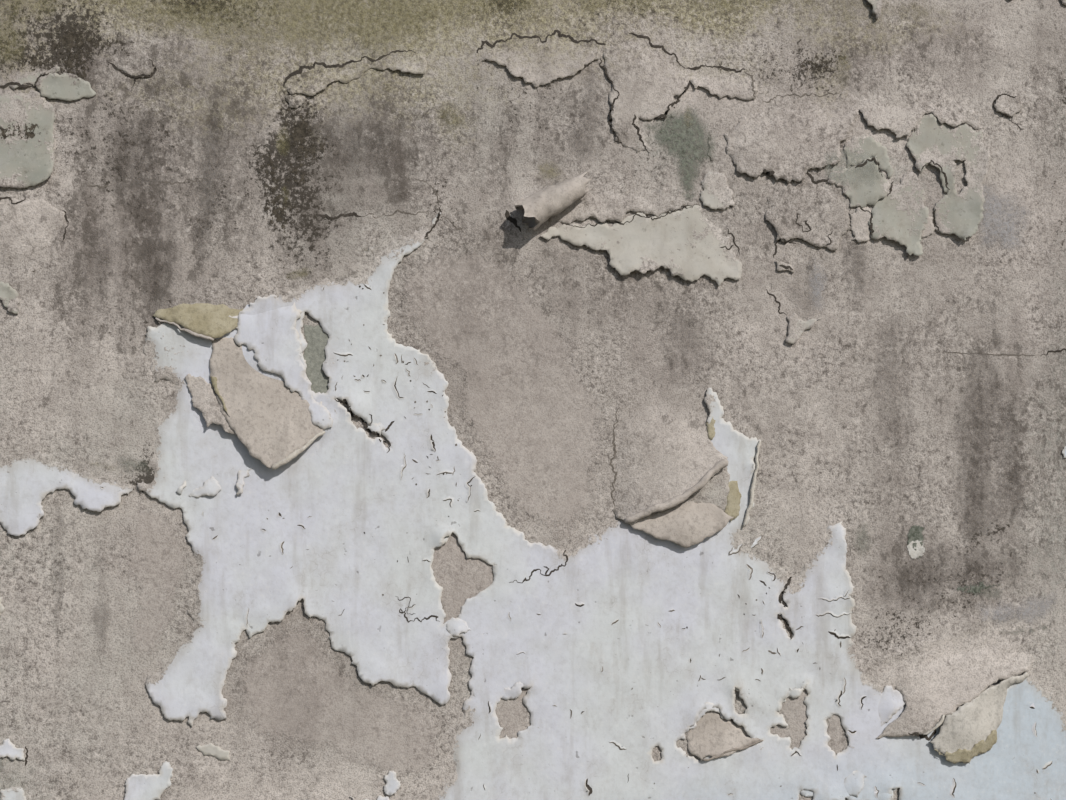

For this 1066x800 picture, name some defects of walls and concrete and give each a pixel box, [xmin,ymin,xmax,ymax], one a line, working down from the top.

mould [19,23,118,80]
leakage [163,0,273,29]
flaking render [284,55,427,108]
flaking render [478,38,758,152]
peeling [0,66,96,274]
mould [255,103,328,240]
flaking render [514,91,990,286]
peeling [0,212,1066,800]